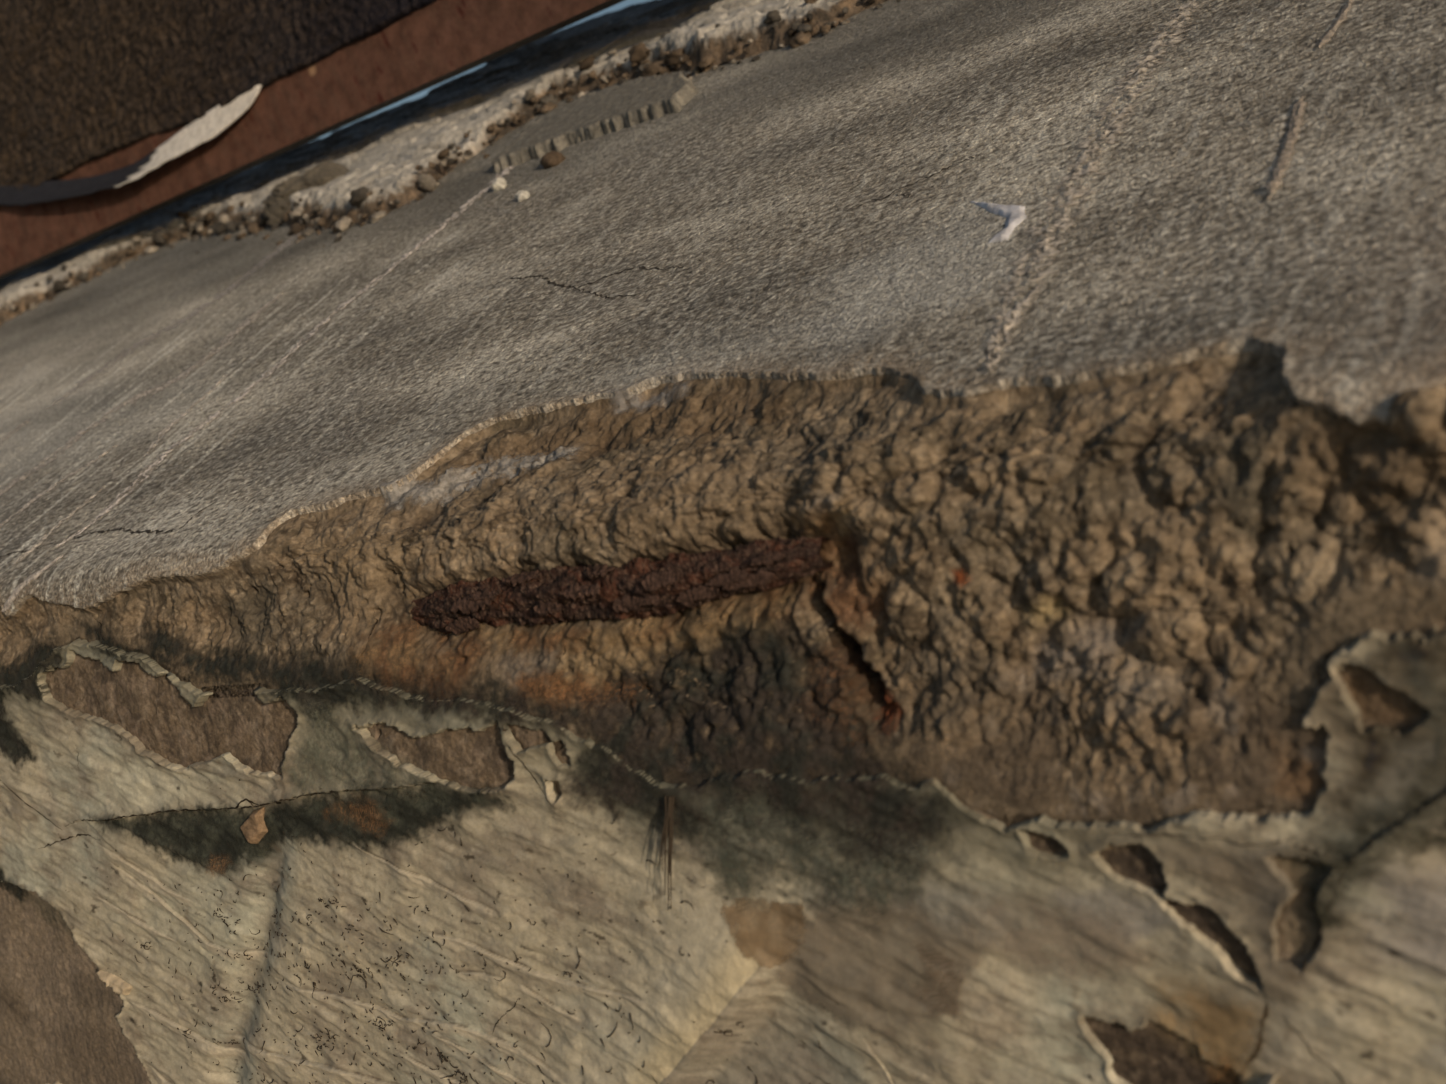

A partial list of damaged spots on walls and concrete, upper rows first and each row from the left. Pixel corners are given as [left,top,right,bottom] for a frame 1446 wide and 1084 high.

spalling [0,350,1446,854]
peeling [1099,844,1261,981]
peeling [1272,855,1326,965]